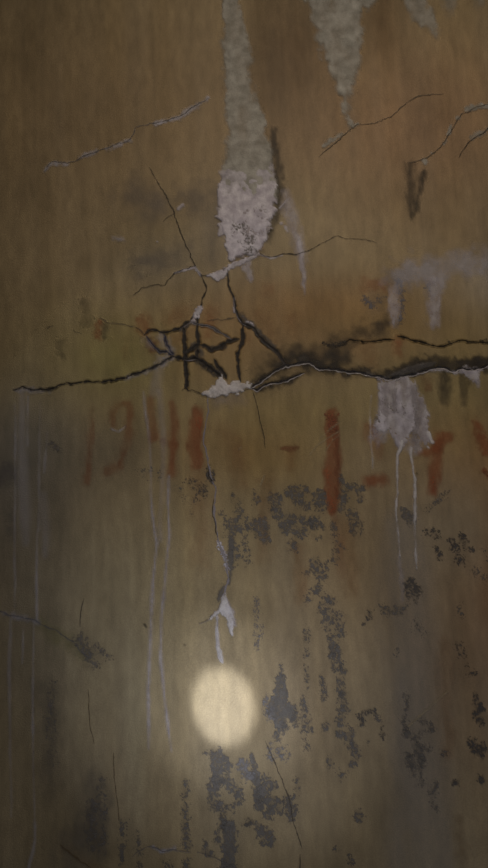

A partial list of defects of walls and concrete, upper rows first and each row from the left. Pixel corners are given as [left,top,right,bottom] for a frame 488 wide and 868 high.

water stain [305,0,374,126]
water stain [216,0,284,275]
crack [13,167,488,658]
efflorescence [374,378,434,521]
peeling [218,474,385,778]
peeling [202,746,300,868]
crack [266,743,302,868]